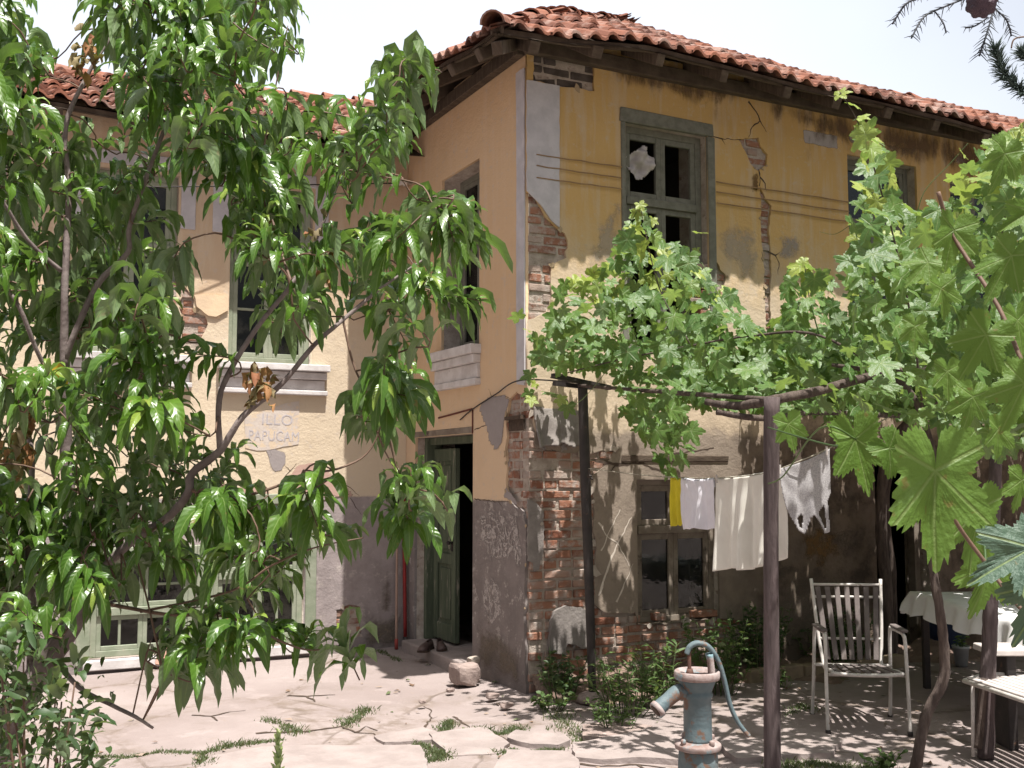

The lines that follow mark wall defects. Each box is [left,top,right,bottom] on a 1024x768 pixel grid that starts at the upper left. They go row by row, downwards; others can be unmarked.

flaking render [533,56,593,93]
crack [713,101,766,144]
flaking render [528,194,567,319]
flaking render [480,393,751,694]